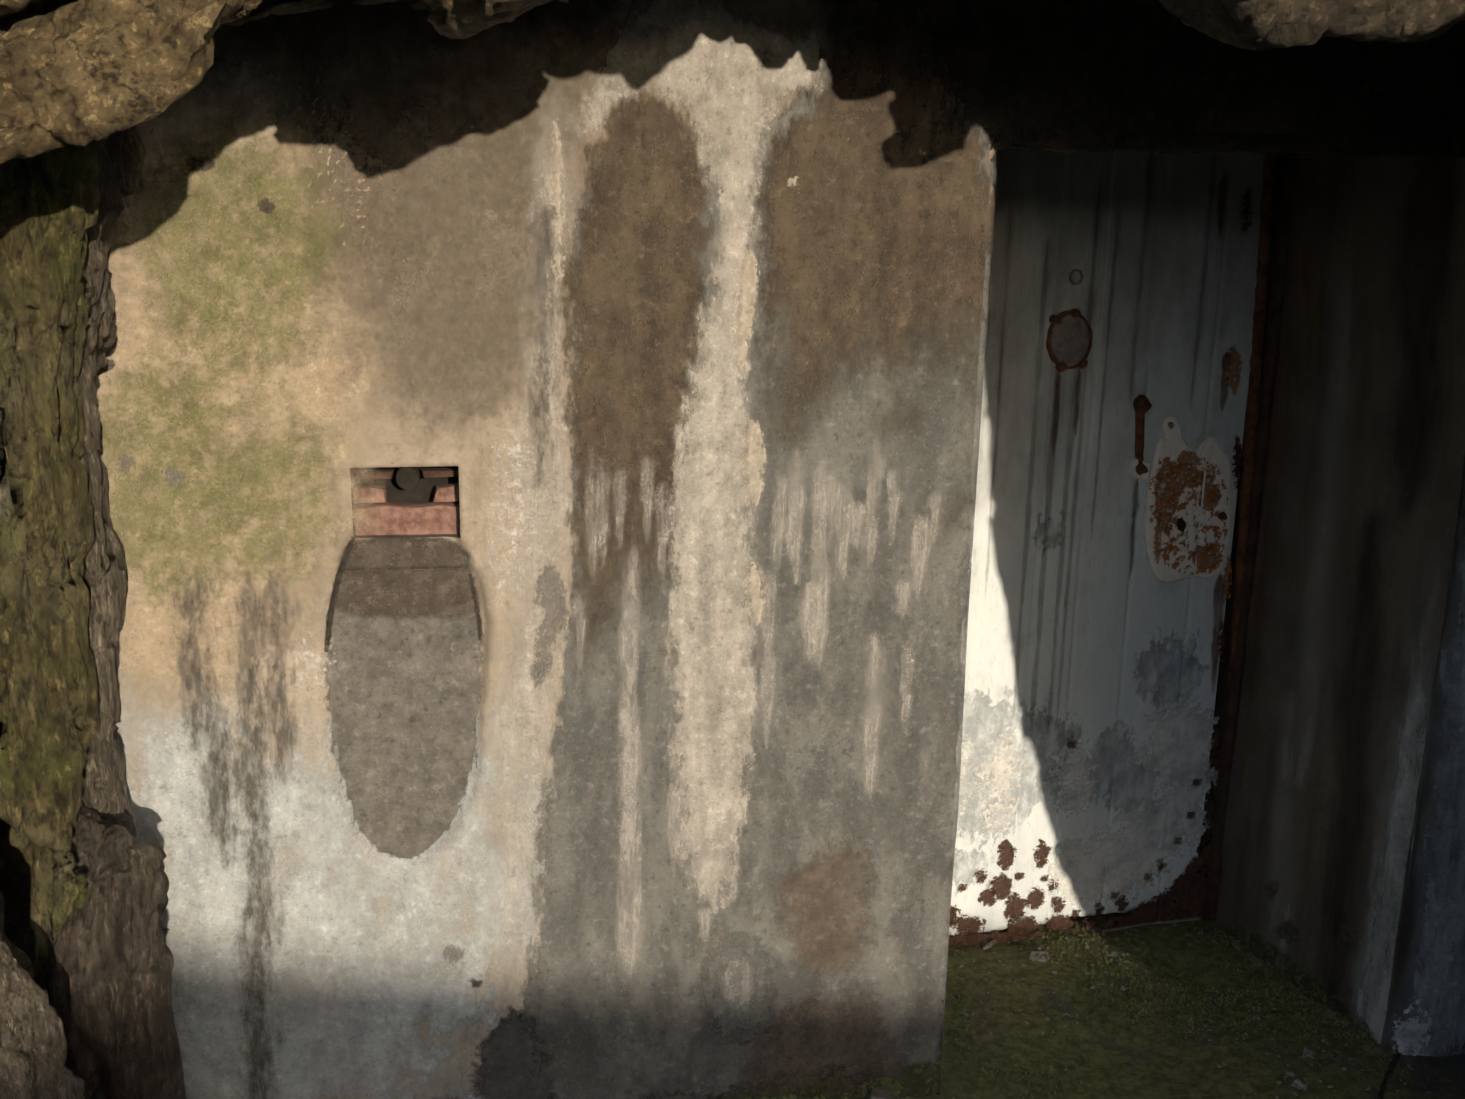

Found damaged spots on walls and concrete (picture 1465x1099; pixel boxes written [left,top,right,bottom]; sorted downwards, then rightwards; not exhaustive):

damp [95,0,609,695]
damp [472,0,1465,1099]
corrosion [1052,359,1088,454]
corrosion [1131,155,1277,687]
damp [210,747,229,817]
damp [233,658,294,829]
damp [242,831,271,1099]